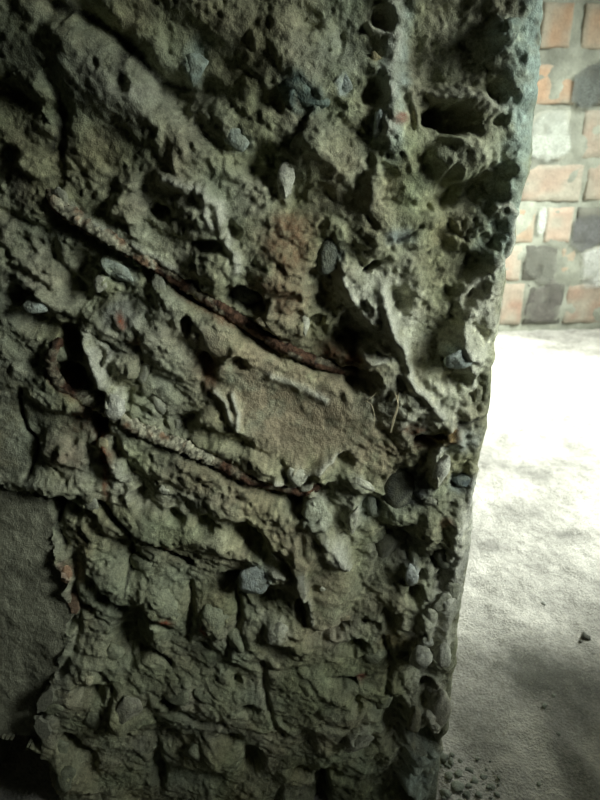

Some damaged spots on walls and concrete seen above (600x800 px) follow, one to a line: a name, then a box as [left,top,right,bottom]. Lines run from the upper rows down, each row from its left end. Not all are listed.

spalling [357,67,389,108]
spalling [419,98,486,137]
spalling [432,171,515,284]
spalling [437,283,499,378]
spalling [473,384,483,403]
spalling [206,352,395,477]
rust [97,417,109,495]
spalling [452,473,471,487]
spalling [238,566,270,594]
spalling [375,529,408,559]
spalling [432,549,450,570]
peeling [0,484,80,740]